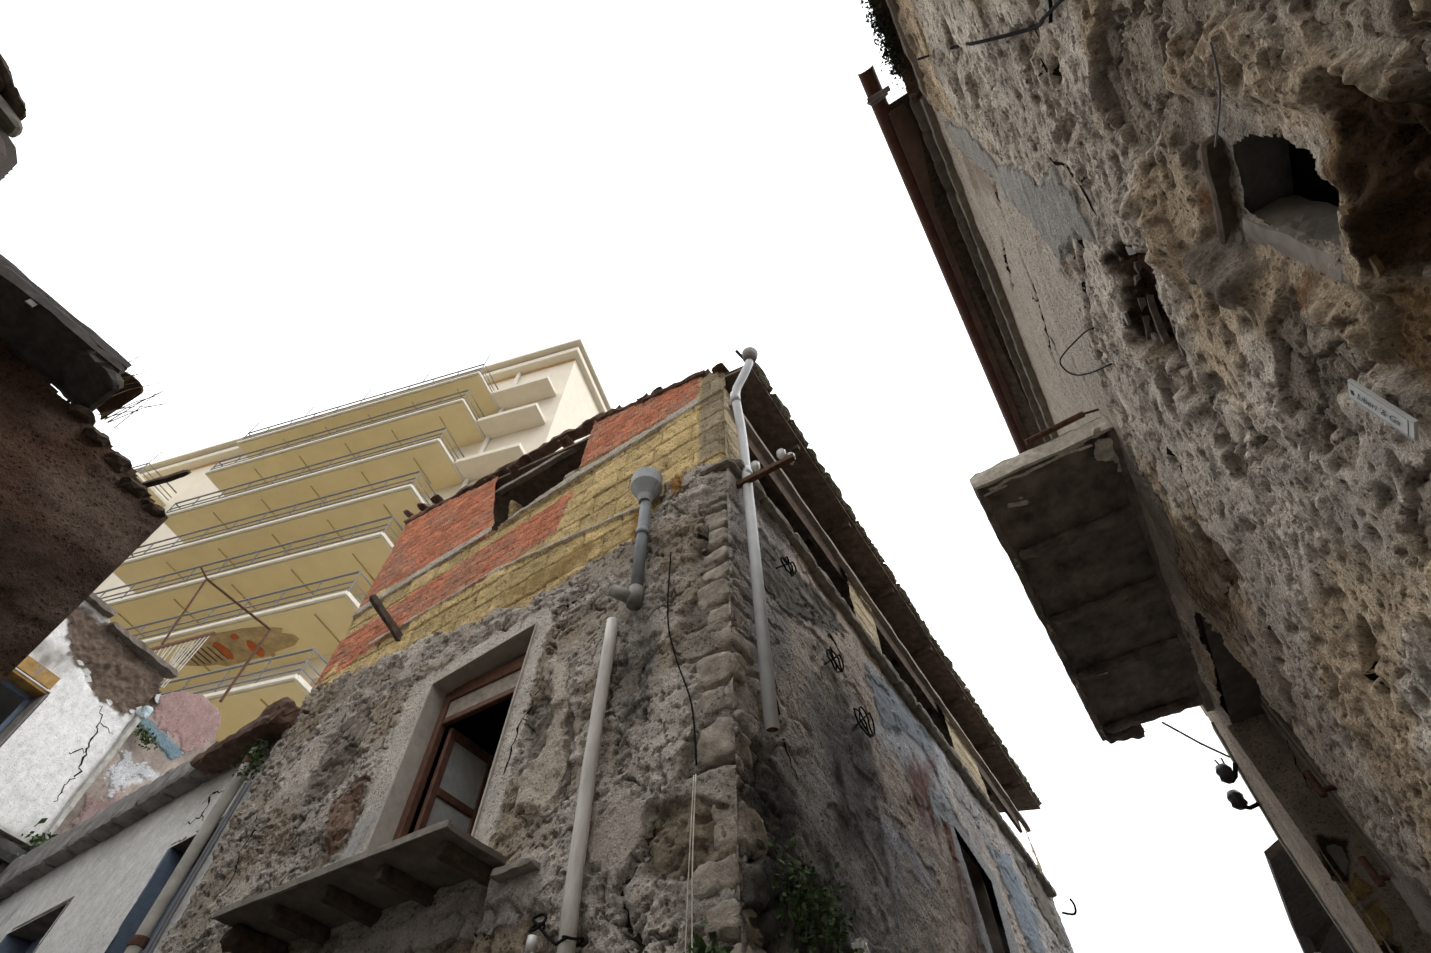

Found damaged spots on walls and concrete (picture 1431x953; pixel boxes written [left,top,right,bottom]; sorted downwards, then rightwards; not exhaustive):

flaking render [66,606,222,759]
spalling [176,627,299,667]
crack [53,706,113,802]
peeling [72,750,163,824]